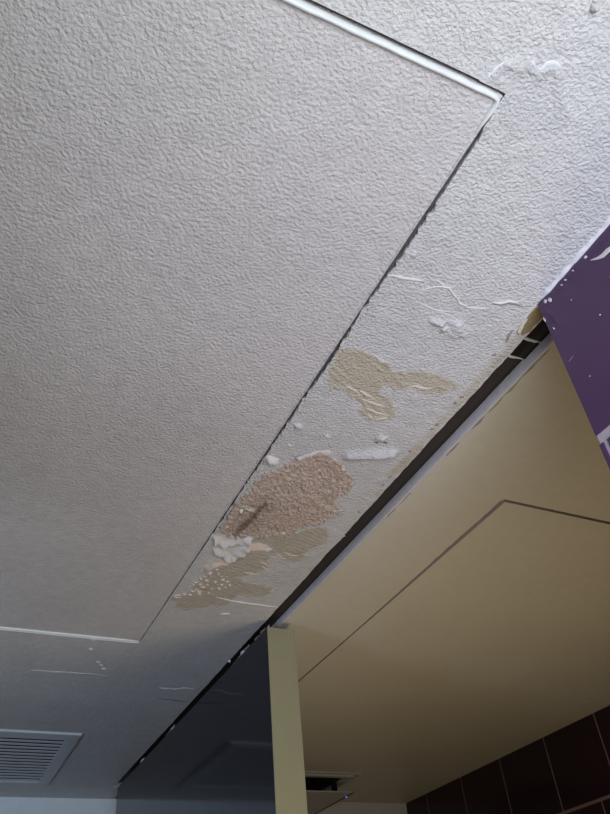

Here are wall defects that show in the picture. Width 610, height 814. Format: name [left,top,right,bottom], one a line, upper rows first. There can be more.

damp [317,339,462,426]
peeling [201,433,359,575]
damp [167,522,345,615]